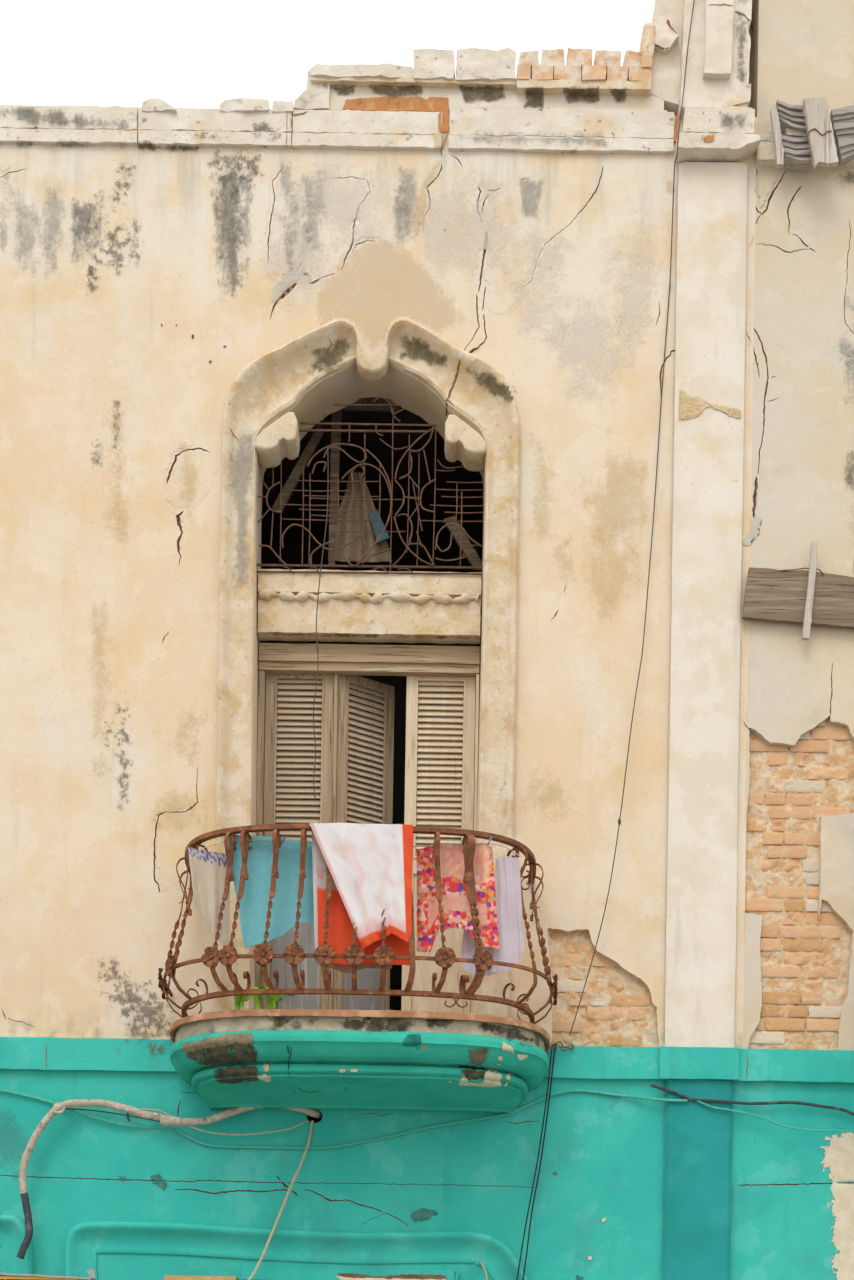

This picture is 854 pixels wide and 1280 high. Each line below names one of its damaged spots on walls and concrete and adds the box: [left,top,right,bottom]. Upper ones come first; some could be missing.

damp [73,195,139,291]
damp [195,132,260,295]
crack [267,112,373,320]
crack [522,168,604,289]
crack [749,168,816,253]
crack [844,220,854,334]
crack [166,429,238,484]
spalling [678,390,741,421]
crack [176,511,185,563]
crack [153,768,199,893]
peeling [820,1132,854,1280]